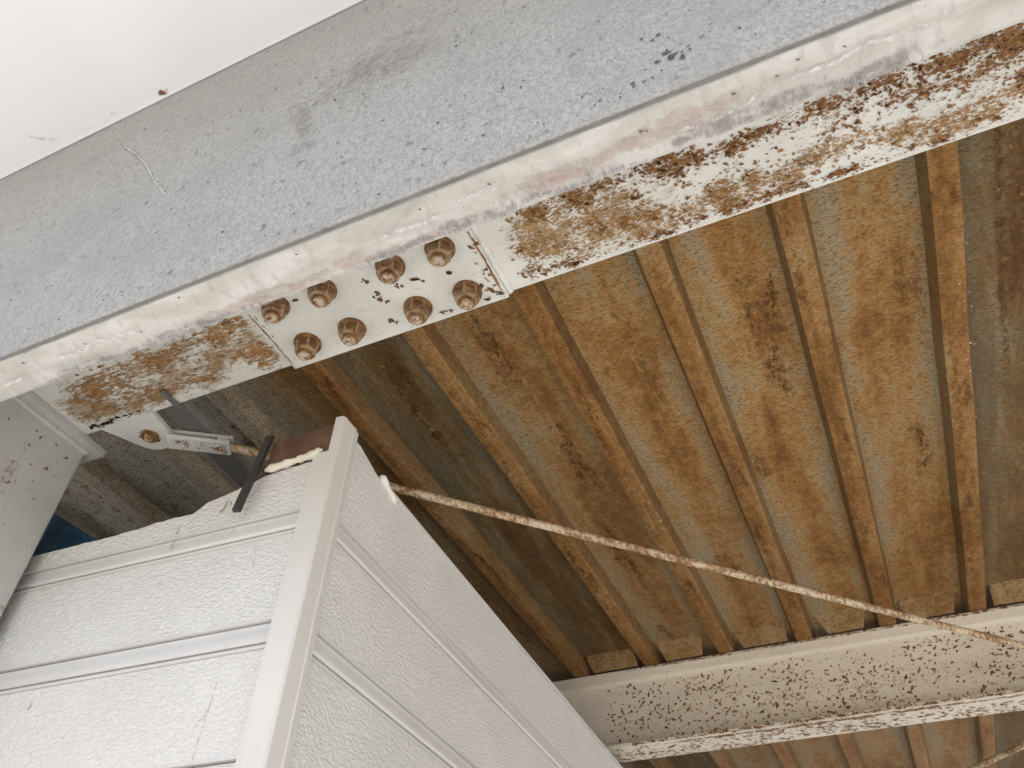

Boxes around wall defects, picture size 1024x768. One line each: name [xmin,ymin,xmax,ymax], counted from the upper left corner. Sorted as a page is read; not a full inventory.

rust [499,23,1024,281]
rust [59,312,293,423]
rust [605,624,1024,761]